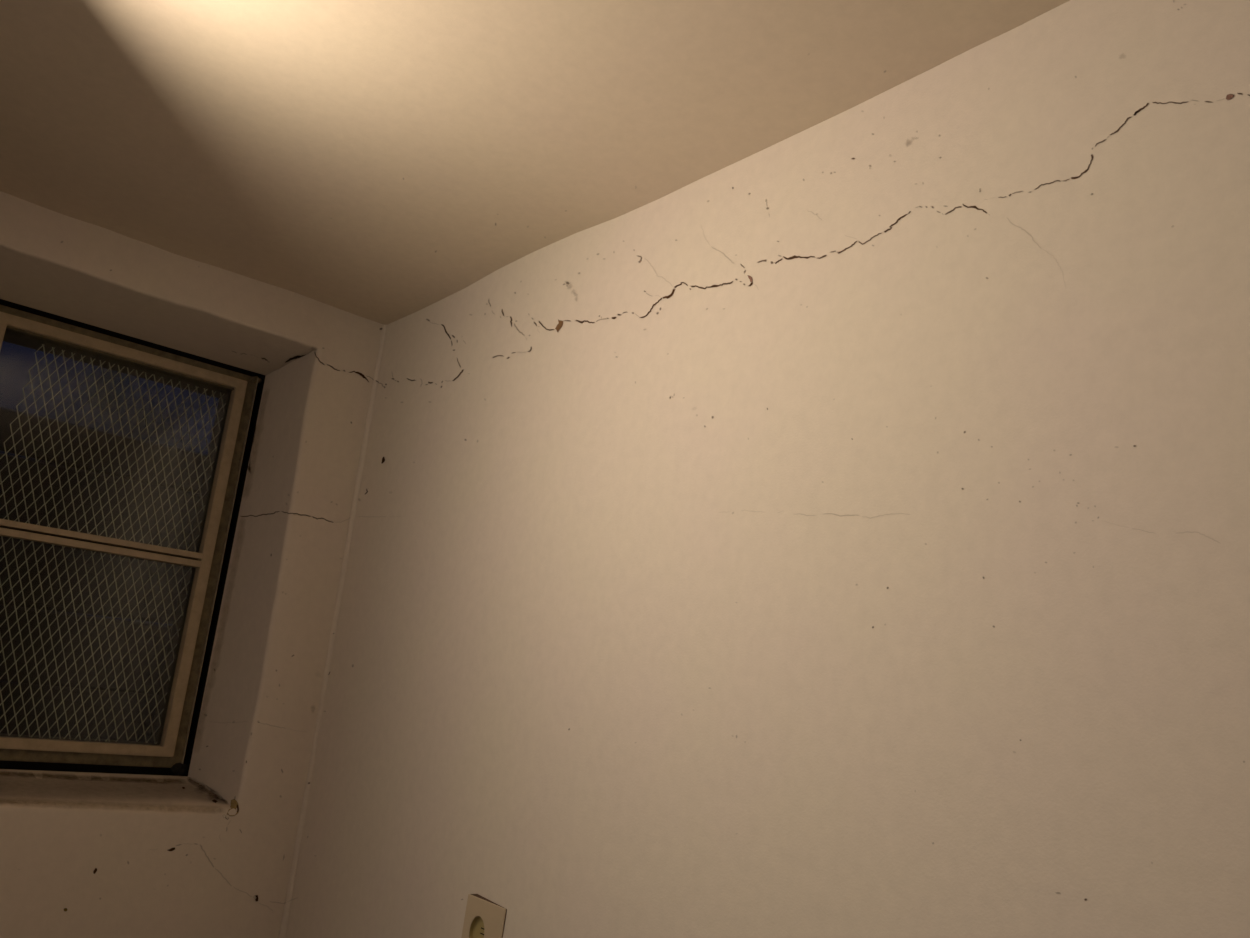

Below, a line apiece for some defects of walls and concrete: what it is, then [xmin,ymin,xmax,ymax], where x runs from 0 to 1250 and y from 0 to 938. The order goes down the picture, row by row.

crack [489,93,1250,359]
crack [262,325,463,388]
crack [241,511,331,522]